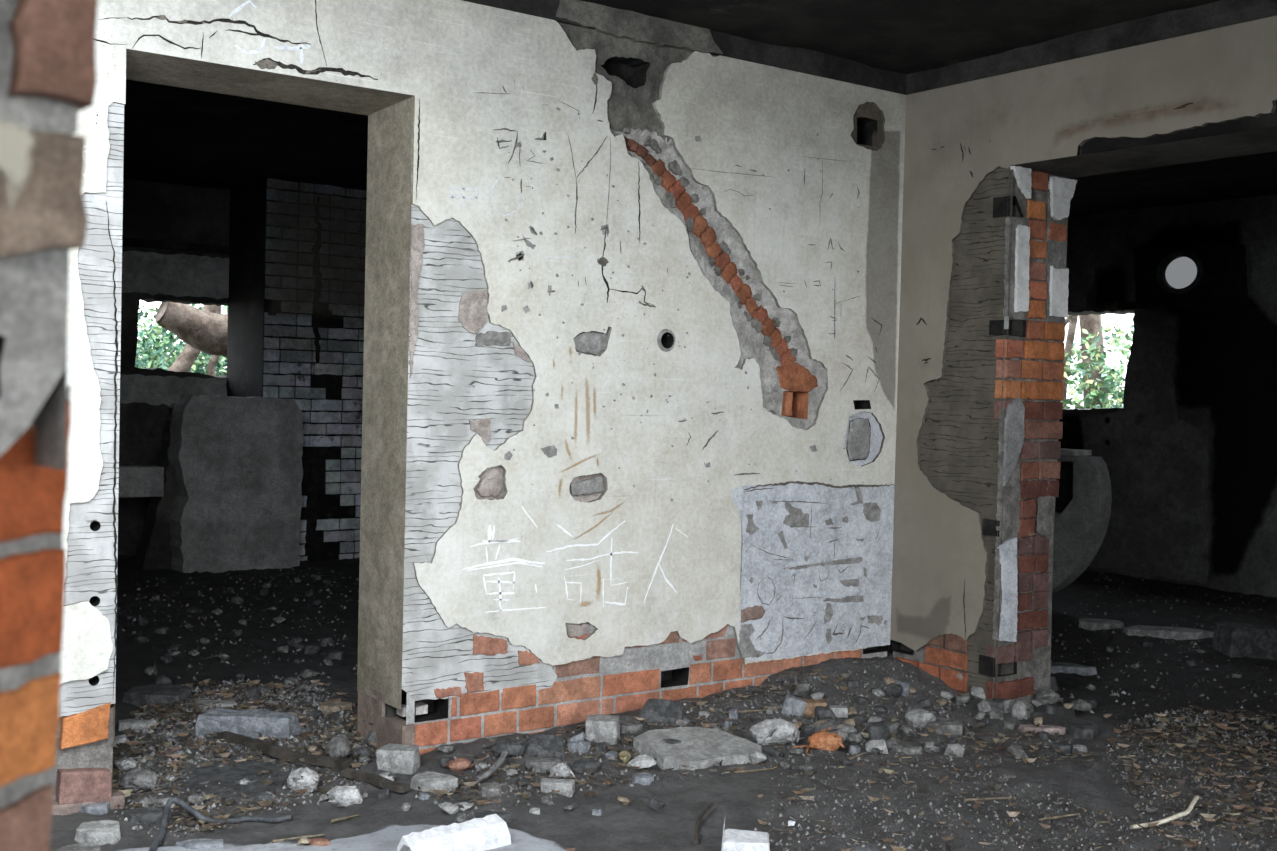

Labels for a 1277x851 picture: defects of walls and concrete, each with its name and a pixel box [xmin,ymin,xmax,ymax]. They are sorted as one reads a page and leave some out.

crack [95,0,378,80]
spalling [556,0,828,430]
flaking render [52,103,230,815]
flaking render [351,166,1112,772]
spalling [475,761,528,787]
spalling [529,788,602,816]